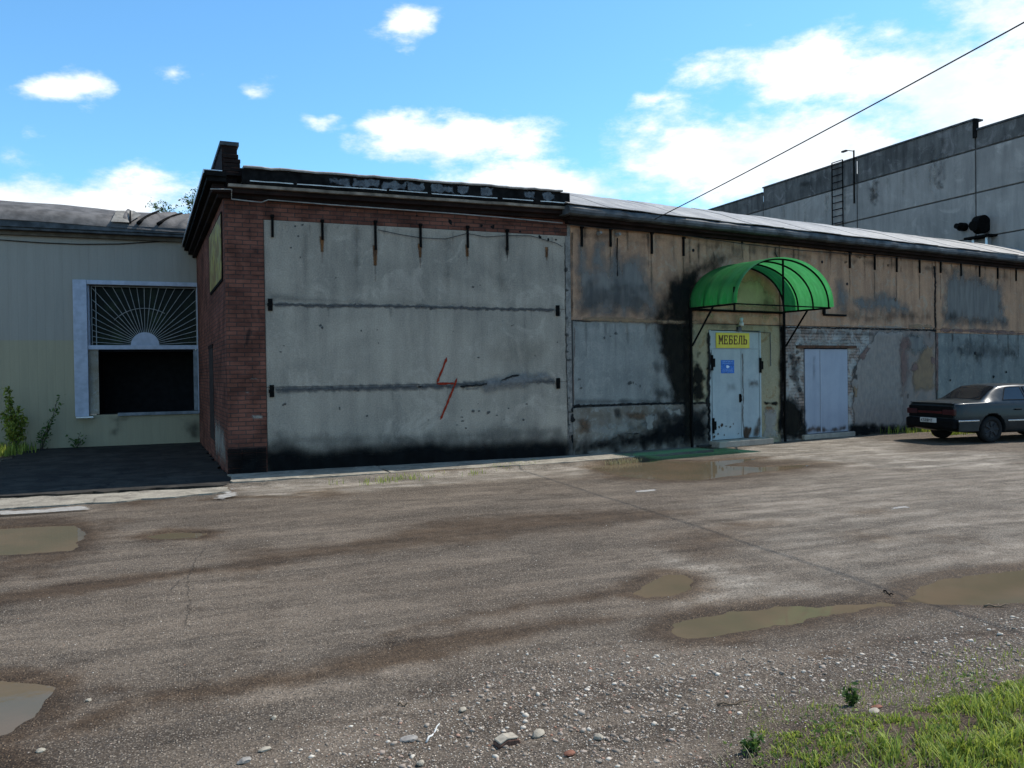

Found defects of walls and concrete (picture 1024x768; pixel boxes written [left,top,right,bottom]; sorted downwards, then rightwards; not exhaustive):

water stain [237,260,723,474]
flaking render [851,331,918,434]